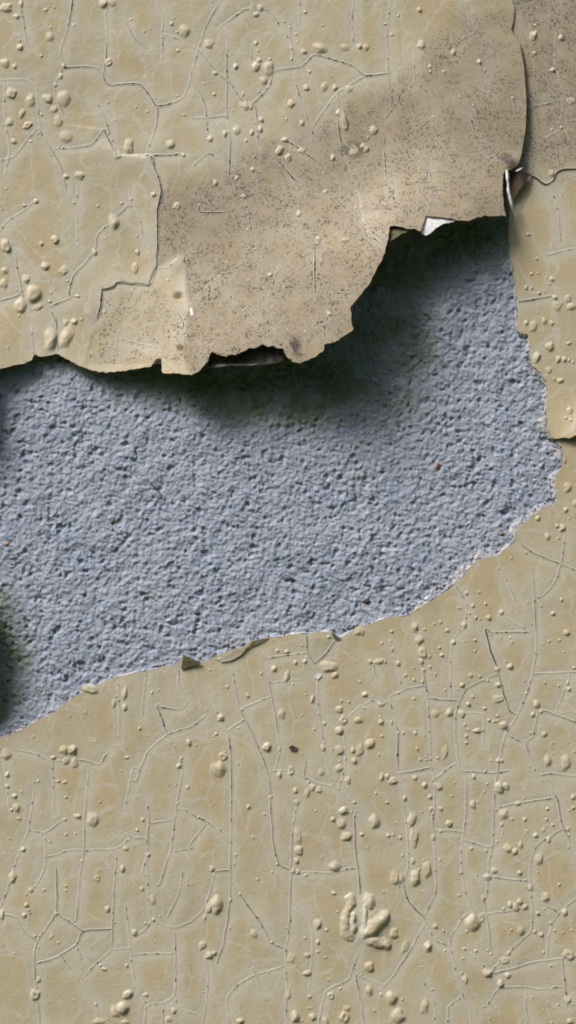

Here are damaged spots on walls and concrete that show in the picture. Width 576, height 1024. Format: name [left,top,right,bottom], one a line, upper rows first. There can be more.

crack [0,0,417,355]
spalling [0,0,562,737]
crack [519,295,552,303]
crack [529,167,576,257]
crack [0,533,576,1024]